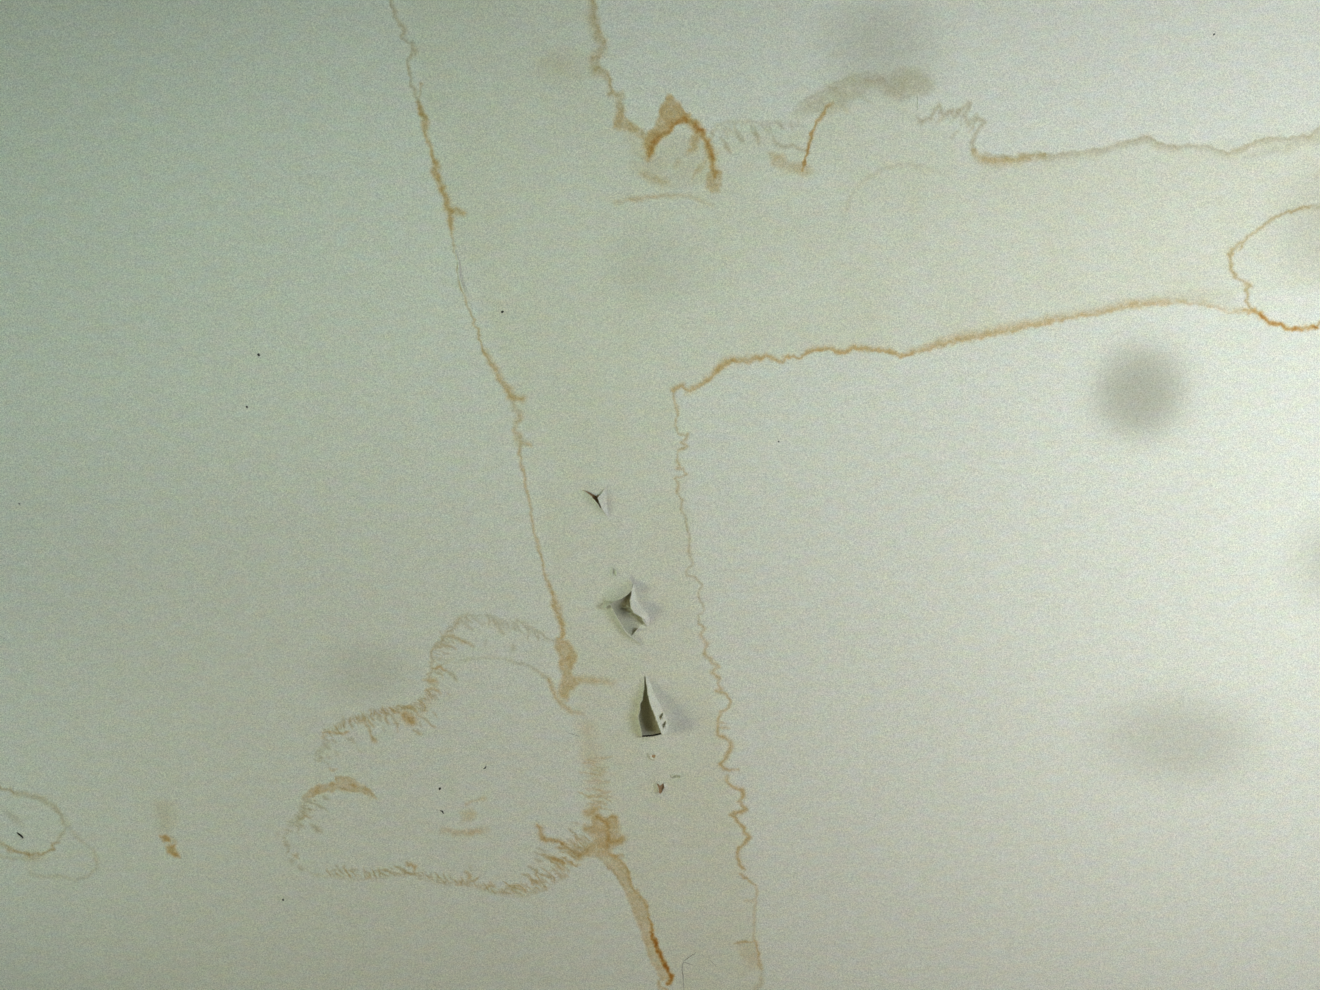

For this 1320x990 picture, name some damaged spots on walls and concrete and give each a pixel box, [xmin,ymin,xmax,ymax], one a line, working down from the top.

leakage [272,0,676,990]
peeling [571,478,609,521]
leakage [668,0,1320,990]
peeling [597,566,650,649]
peeling [621,668,669,744]
leakage [0,783,101,884]